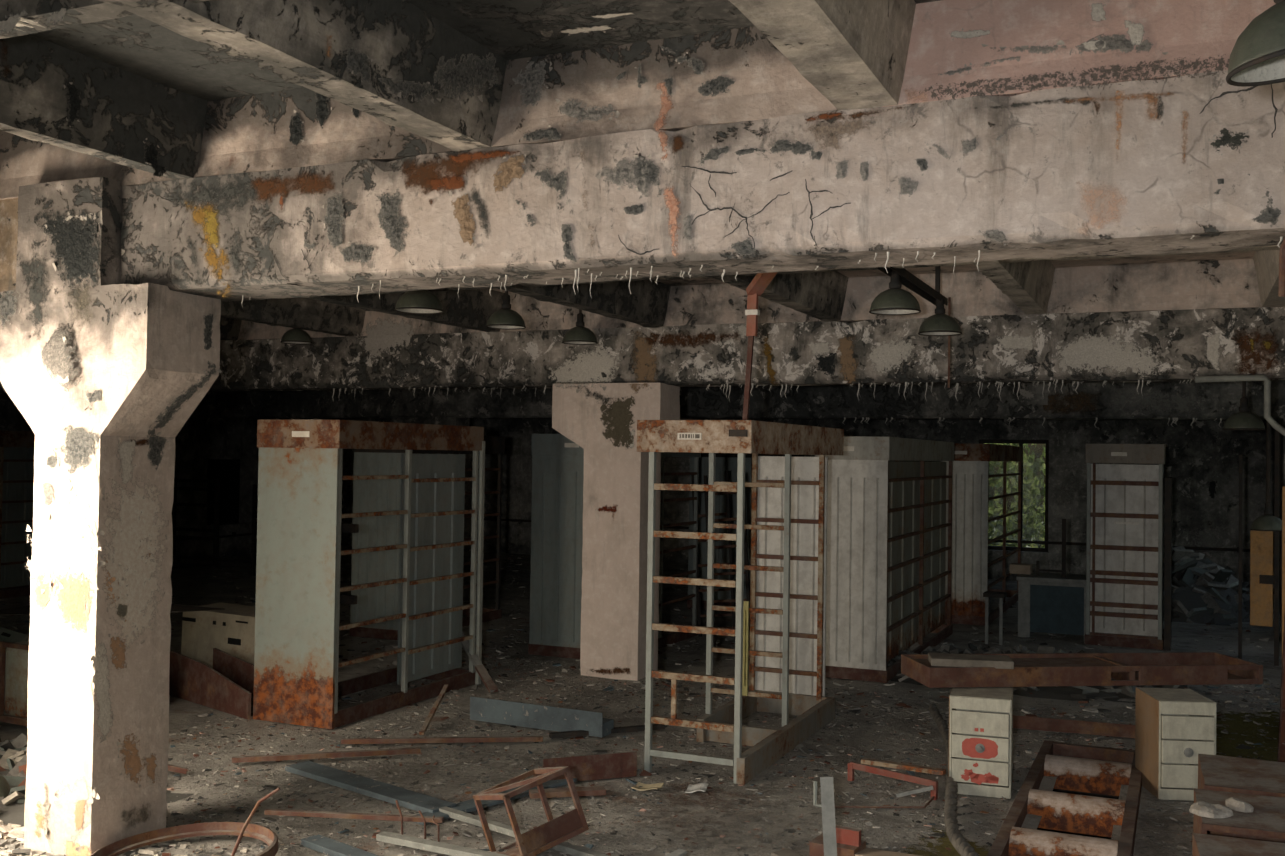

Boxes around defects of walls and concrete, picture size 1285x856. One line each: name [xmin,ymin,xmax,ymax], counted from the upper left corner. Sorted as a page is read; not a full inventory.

spalling [660,46,735,96]
rust [654,83,684,160]
crack [1200,84,1278,138]
spalling [34,209,125,288]
rust [252,173,335,210]
rust [402,150,519,205]
rust [665,188,681,256]
crack [618,166,851,255]
water stain [570,331,741,448]
water stain [763,334,777,384]
flaking render [26,314,222,787]